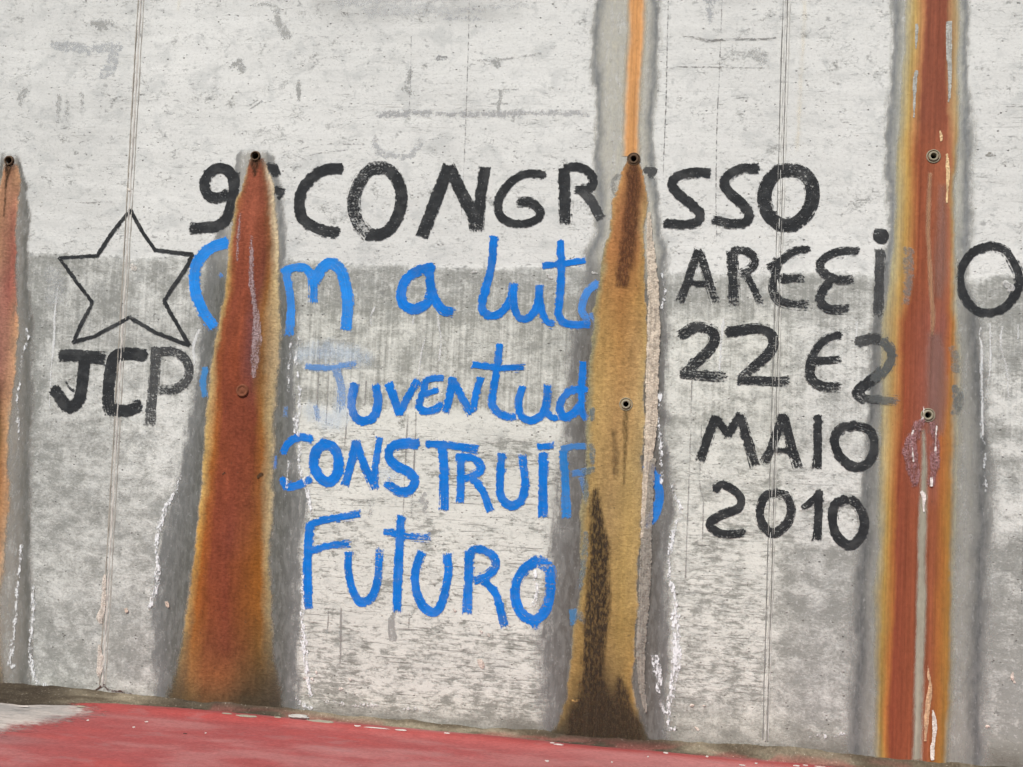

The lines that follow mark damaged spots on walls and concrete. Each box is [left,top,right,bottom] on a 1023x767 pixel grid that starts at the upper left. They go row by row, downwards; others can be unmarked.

rust [0,164,21,585]
rust [167,158,282,708]
leakage [530,0,628,732]
rust [551,0,661,740]
leakage [632,0,683,740]
rust [868,0,963,763]